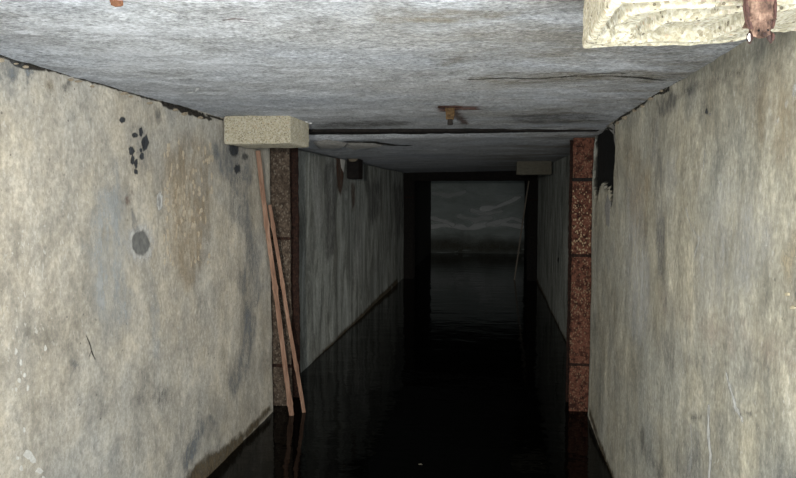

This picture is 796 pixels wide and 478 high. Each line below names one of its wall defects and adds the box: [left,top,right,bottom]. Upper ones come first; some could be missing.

rust [439,106,480,124]
leakage [129,127,149,174]
spalling [594,124,615,227]
leakage [128,225,152,258]